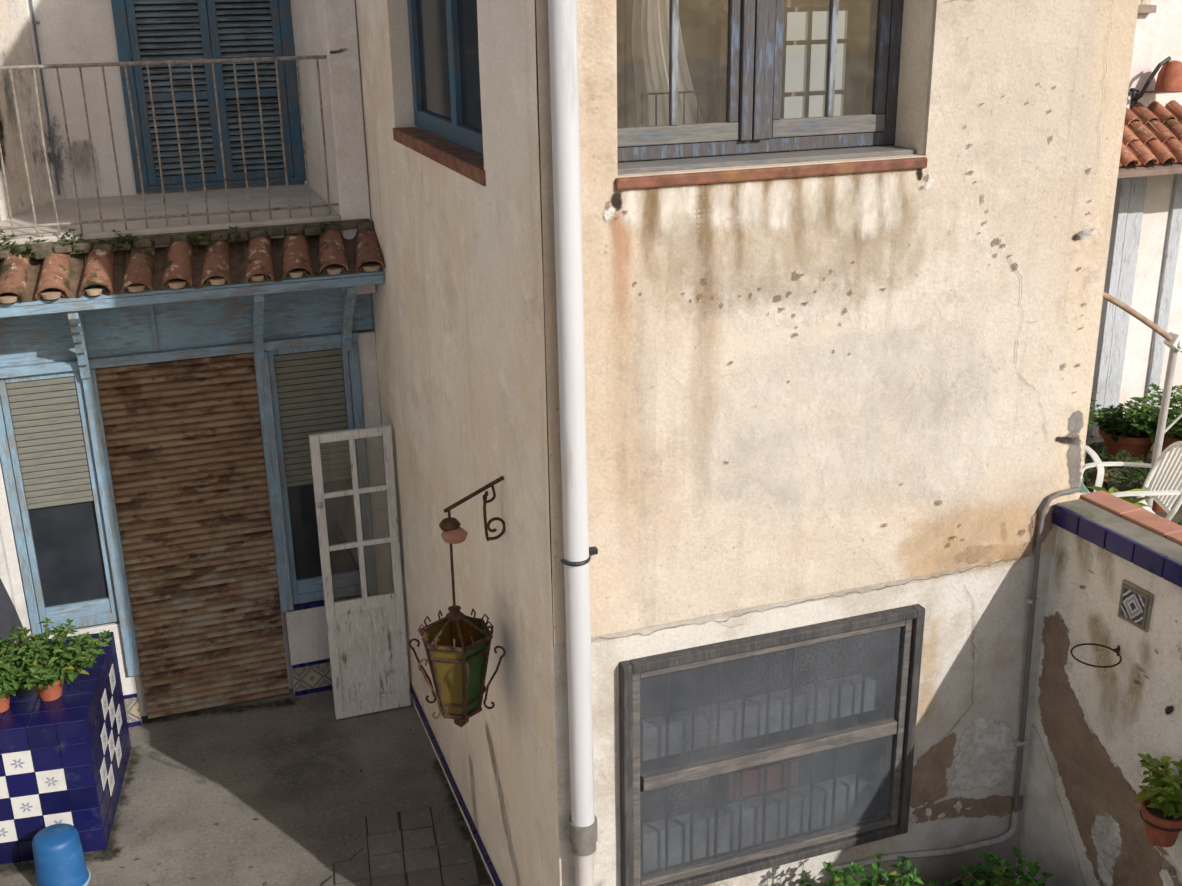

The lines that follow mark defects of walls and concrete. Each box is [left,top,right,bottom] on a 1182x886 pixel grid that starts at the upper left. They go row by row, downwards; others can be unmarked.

damp [624,176,895,254]
peeling [910,717,1023,823]
peeling [1038,612,1182,886]